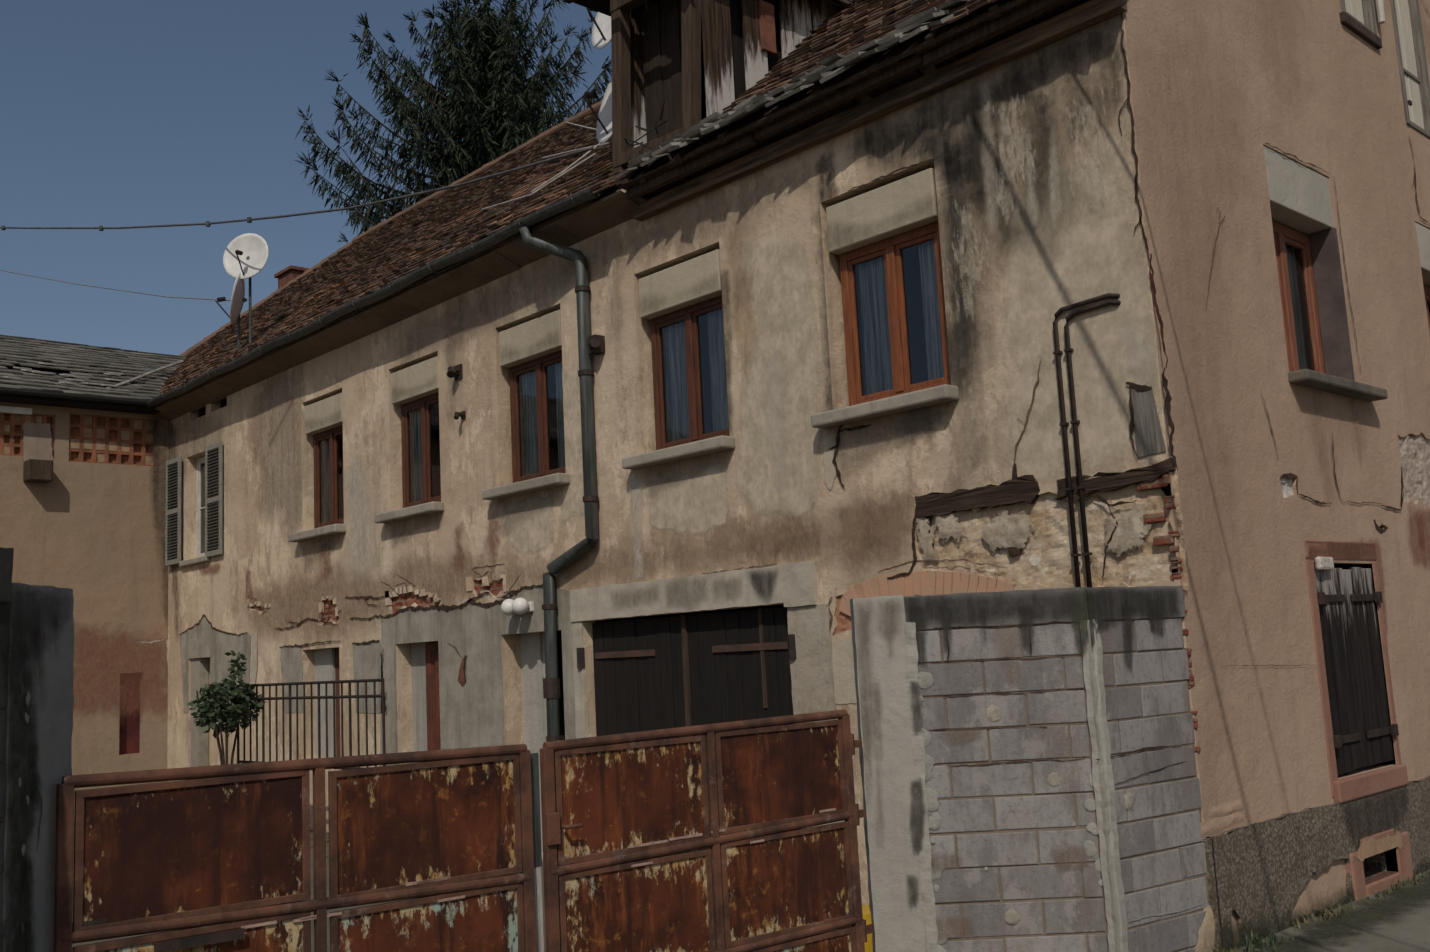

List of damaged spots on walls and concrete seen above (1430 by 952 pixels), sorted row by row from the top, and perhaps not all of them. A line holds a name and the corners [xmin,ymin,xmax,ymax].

leakage [858,23,1155,480]
crack [1118,12,1176,459]
crack [1012,357,1042,474]
crack [829,424,871,488]
crack [1299,434,1404,511]
flaking render [1398,434,1430,511]
flaking render [381,574,441,613]
flaking render [466,563,522,596]
leakage [905,594,1073,662]
flaking render [914,458,1195,689]
leakage [1092,589,1178,667]
leakage [912,682,921,731]